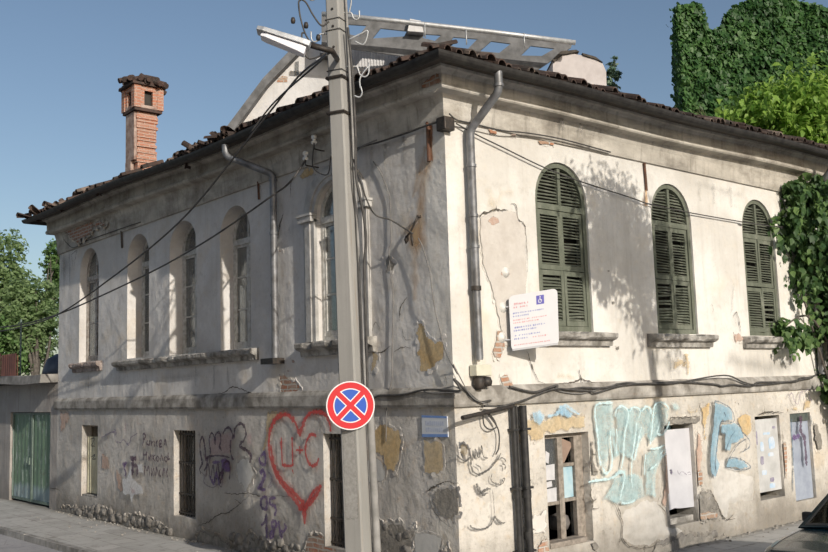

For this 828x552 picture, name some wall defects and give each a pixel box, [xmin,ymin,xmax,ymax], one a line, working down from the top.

flaking render [478,208,528,362]
peeling [415,320,447,375]
flaking render [278,372,303,392]
peeling [735,401,751,438]
peeling [375,422,404,477]
peeling [518,412,599,487]
crack [203,493,287,524]
flaking render [422,437,463,525]
flaking render [302,531,338,552]